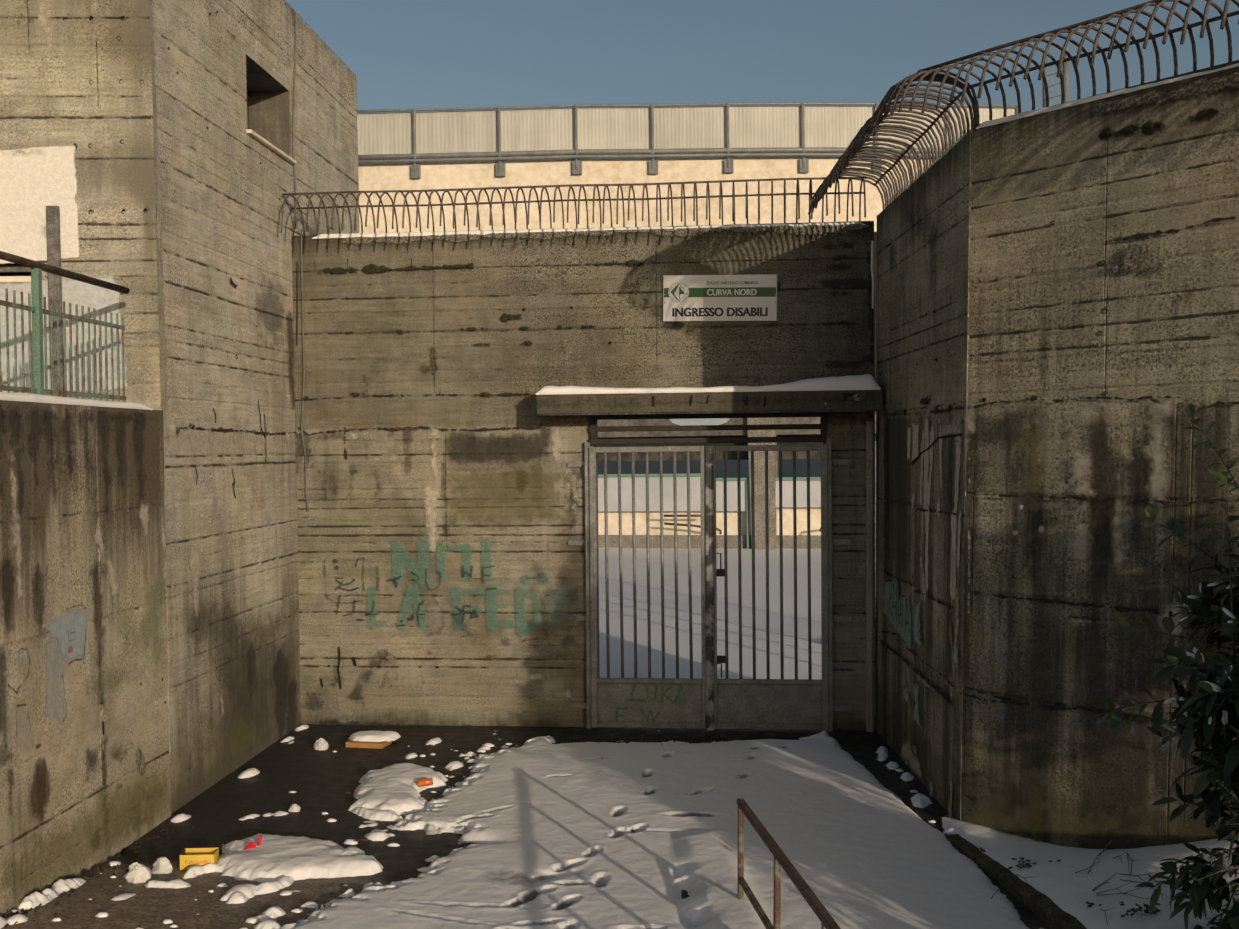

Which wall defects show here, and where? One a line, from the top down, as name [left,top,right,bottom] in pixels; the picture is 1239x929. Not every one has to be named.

water stain [0,404,174,634]
water stain [92,528,118,701]
water stain [907,415,962,701]
water stain [1065,417,1178,575]